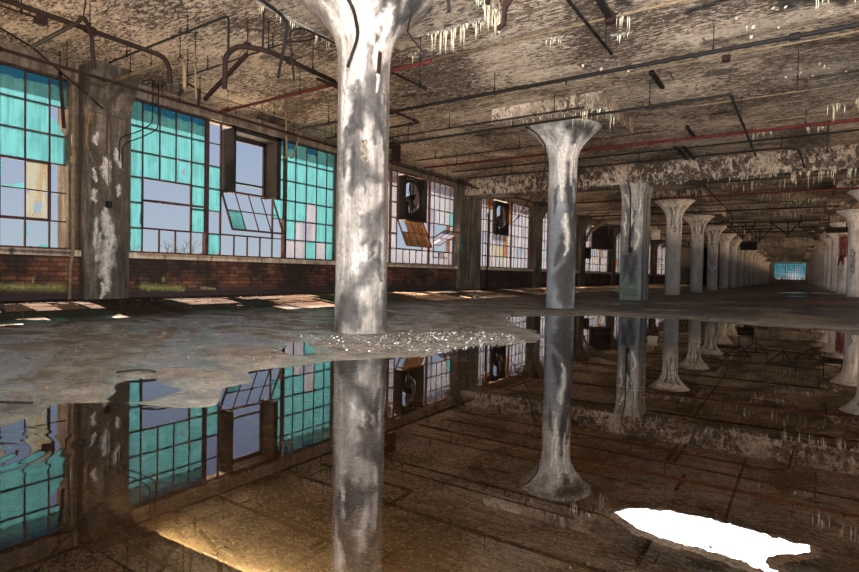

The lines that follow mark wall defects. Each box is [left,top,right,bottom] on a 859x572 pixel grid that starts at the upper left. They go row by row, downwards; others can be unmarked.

damp [776,0,816,10]
damp [320,0,423,196]
damp [336,205,388,333]
damp [554,121,592,306]